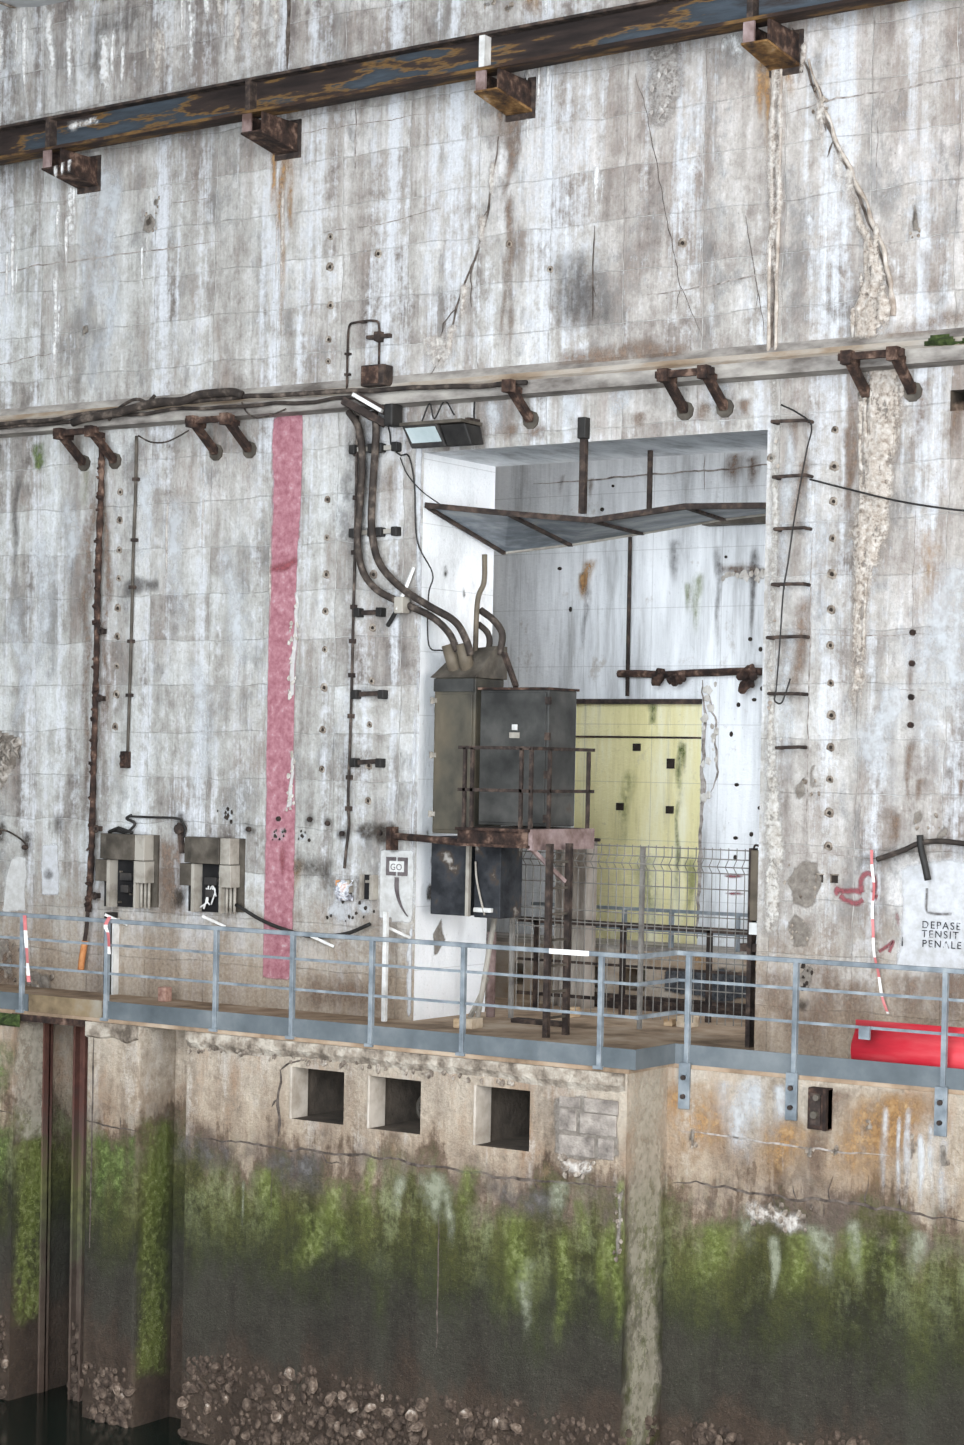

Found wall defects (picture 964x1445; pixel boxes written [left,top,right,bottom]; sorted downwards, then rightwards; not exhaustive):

corrosion [757,63,771,129]
corrosion [498,110,519,181]
crack [792,28,889,288]
crack [431,136,499,374]
damp [426,1175,452,1219]
damp [630,1079,663,1442]
damp [771,1239,779,1281]